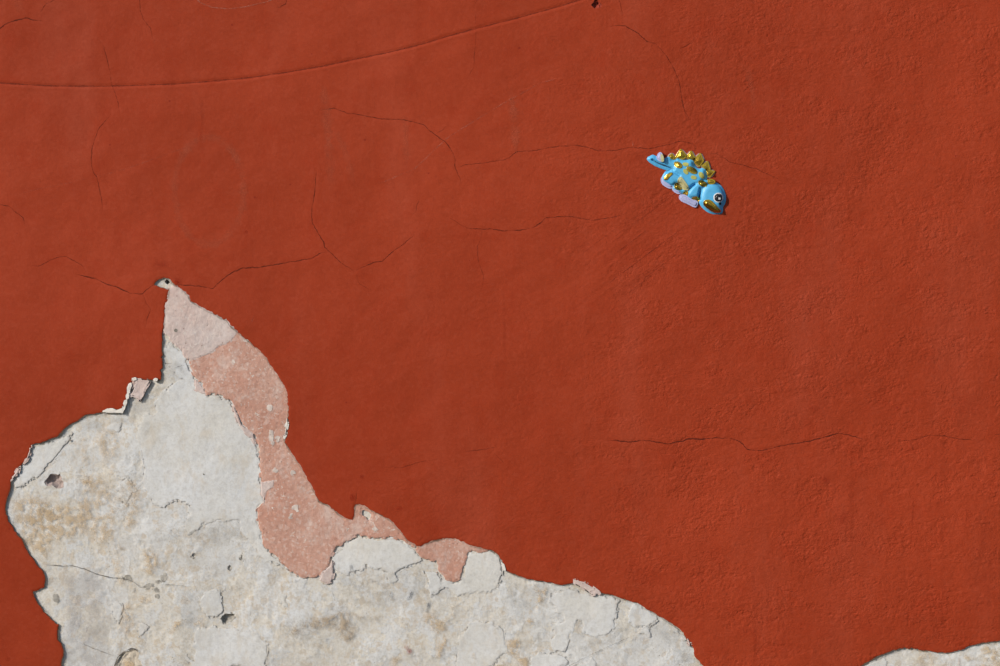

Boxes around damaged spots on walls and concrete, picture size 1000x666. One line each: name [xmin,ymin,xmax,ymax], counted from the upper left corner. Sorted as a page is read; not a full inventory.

crack [184,178,409,289]
peeling [6,277,703,666]
crack [614,433,858,451]
peeling [862,641,1000,666]